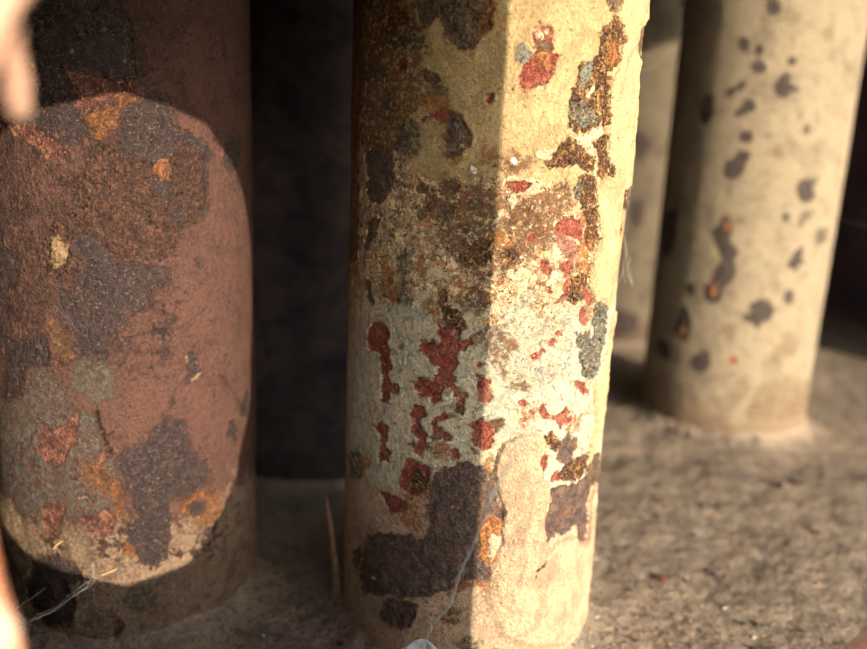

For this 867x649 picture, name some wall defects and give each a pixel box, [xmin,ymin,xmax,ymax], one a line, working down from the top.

peeling [483,20,561,105]
corrosion [0,0,243,363]
corrosion [365,145,397,203]
peeling [565,126,603,179]
corrosion [423,277,469,329]
corrosion [464,231,520,287]
peeling [539,215,597,304]
corrosion [673,216,739,342]
corrosion [78,397,225,567]
peeling [367,321,493,513]
peeling [468,417,505,455]
peeling [540,454,562,483]